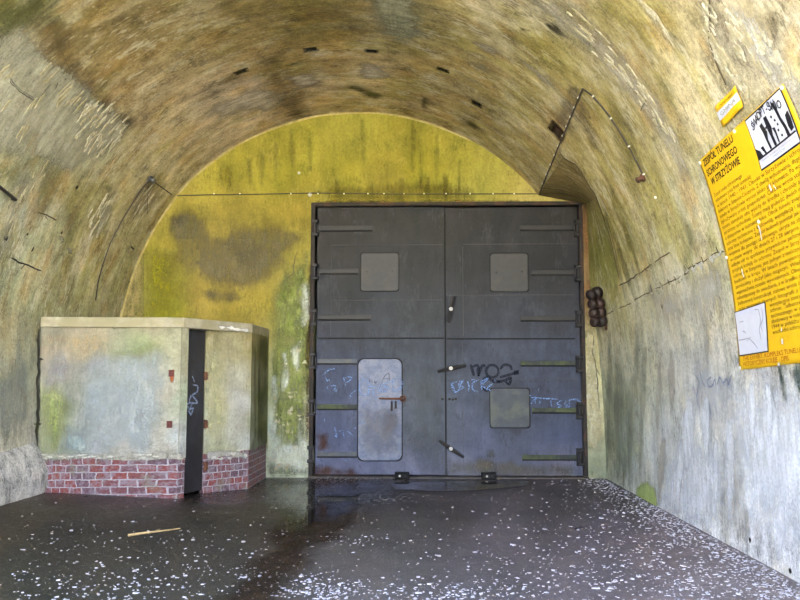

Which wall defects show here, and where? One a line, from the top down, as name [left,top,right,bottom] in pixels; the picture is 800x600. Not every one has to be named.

crack [10,70,58,101]
crack [4,236,41,271]
water stain [171,212,299,302]
crack [560,154,725,314]